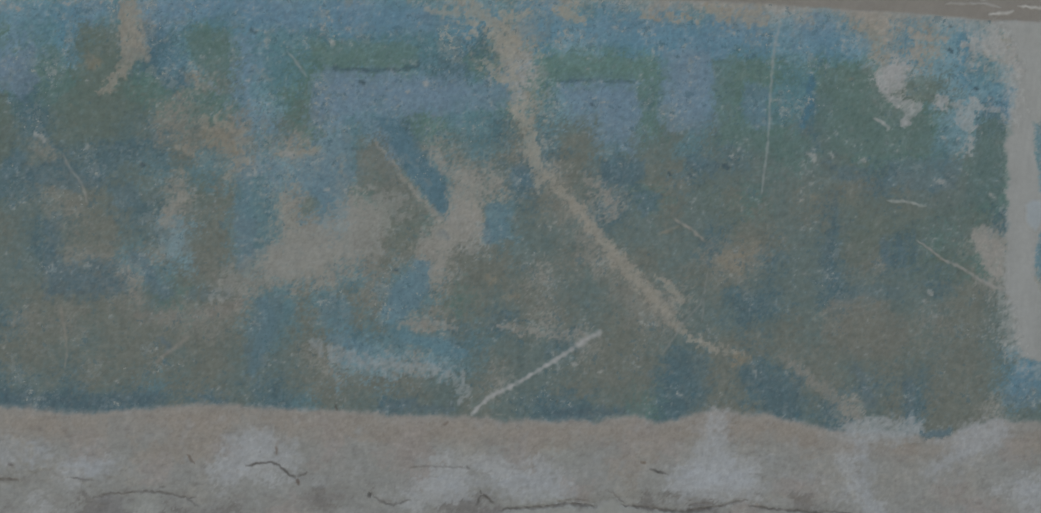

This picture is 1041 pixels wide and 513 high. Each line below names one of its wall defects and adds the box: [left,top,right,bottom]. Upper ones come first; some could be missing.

crack [0,475,20,483]
crack [245,445,308,486]
crack [649,467,669,476]
crack [70,476,201,508]
crack [366,484,412,508]
crack [474,489,855,513]